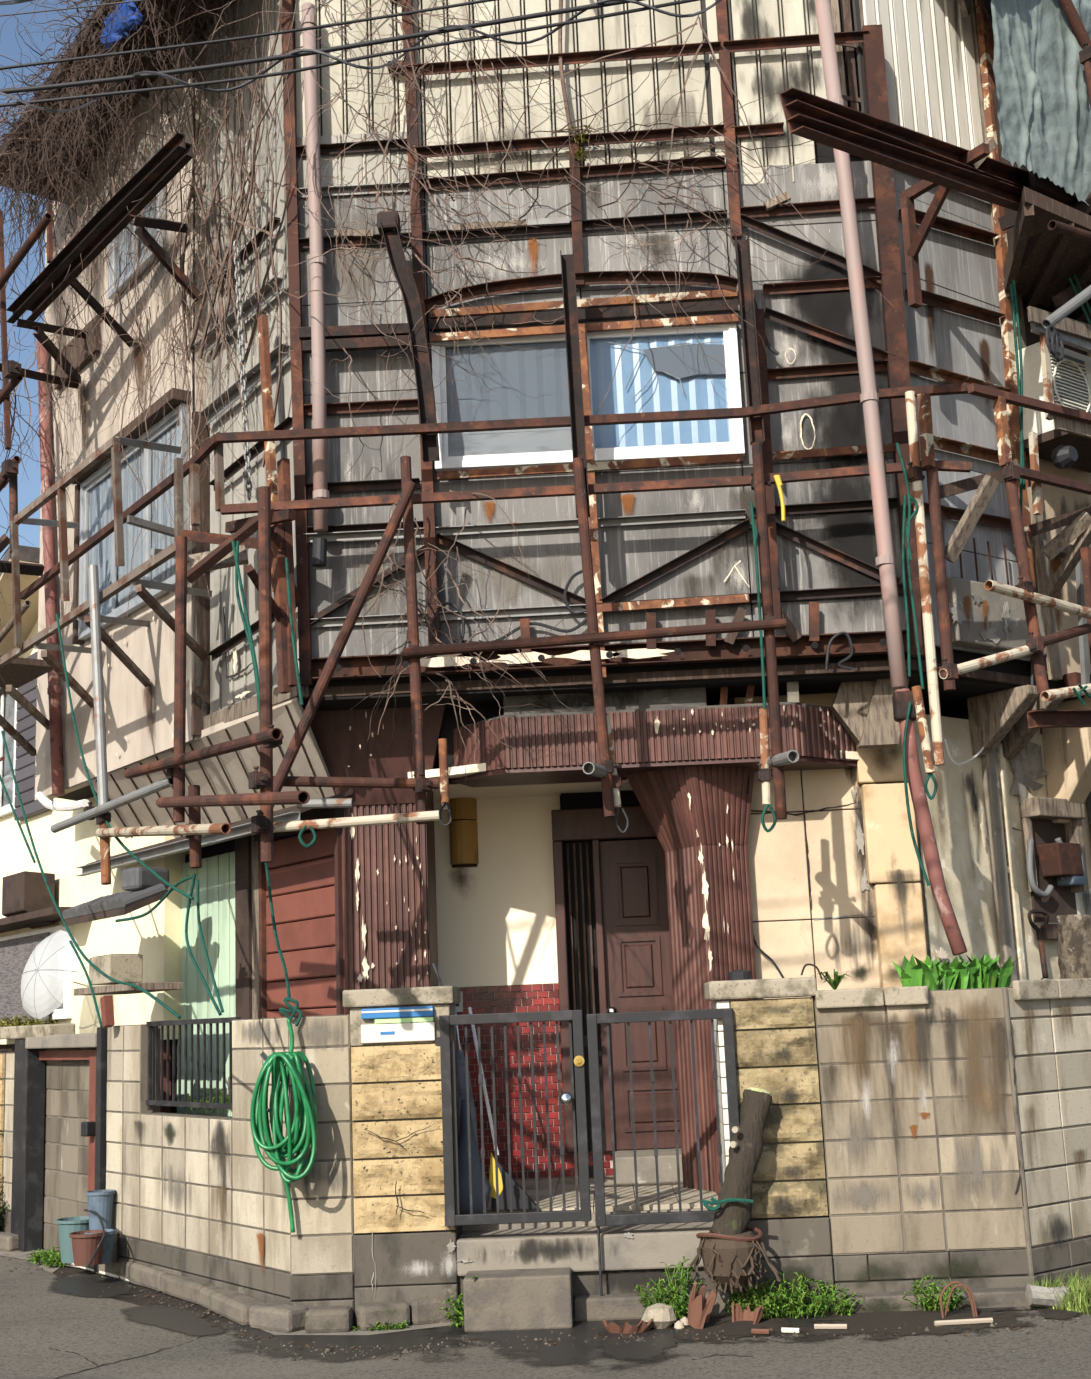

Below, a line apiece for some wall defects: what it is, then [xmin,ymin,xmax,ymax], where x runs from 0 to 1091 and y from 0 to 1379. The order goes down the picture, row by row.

water stain [742,0,768,39]
water stain [752,56,818,156]
peeling [655,710,755,735]
water stain [967,772,978,821]
peeling [355,858,379,983]
peeling [696,829,735,971]
water stain [890,869,905,917]
water stain [242,1021,278,1044]
water stain [825,1006,1006,1112]
water stain [165,1124,175,1143]
water stain [211,1121,229,1227]
water stain [304,1166,343,1195]